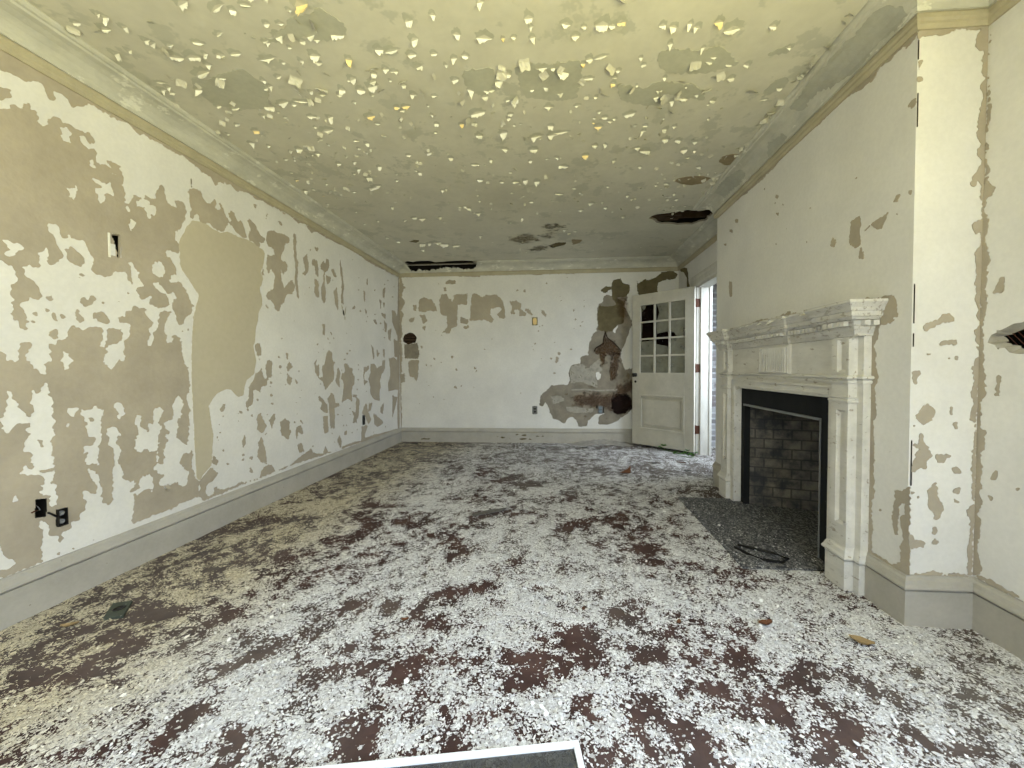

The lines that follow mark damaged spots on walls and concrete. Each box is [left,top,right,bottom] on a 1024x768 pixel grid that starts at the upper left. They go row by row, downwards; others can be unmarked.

peeling [0,50,690,578]
peeling [66,0,753,225]
peeling [746,45,831,130]
peeling [848,26,1024,598]